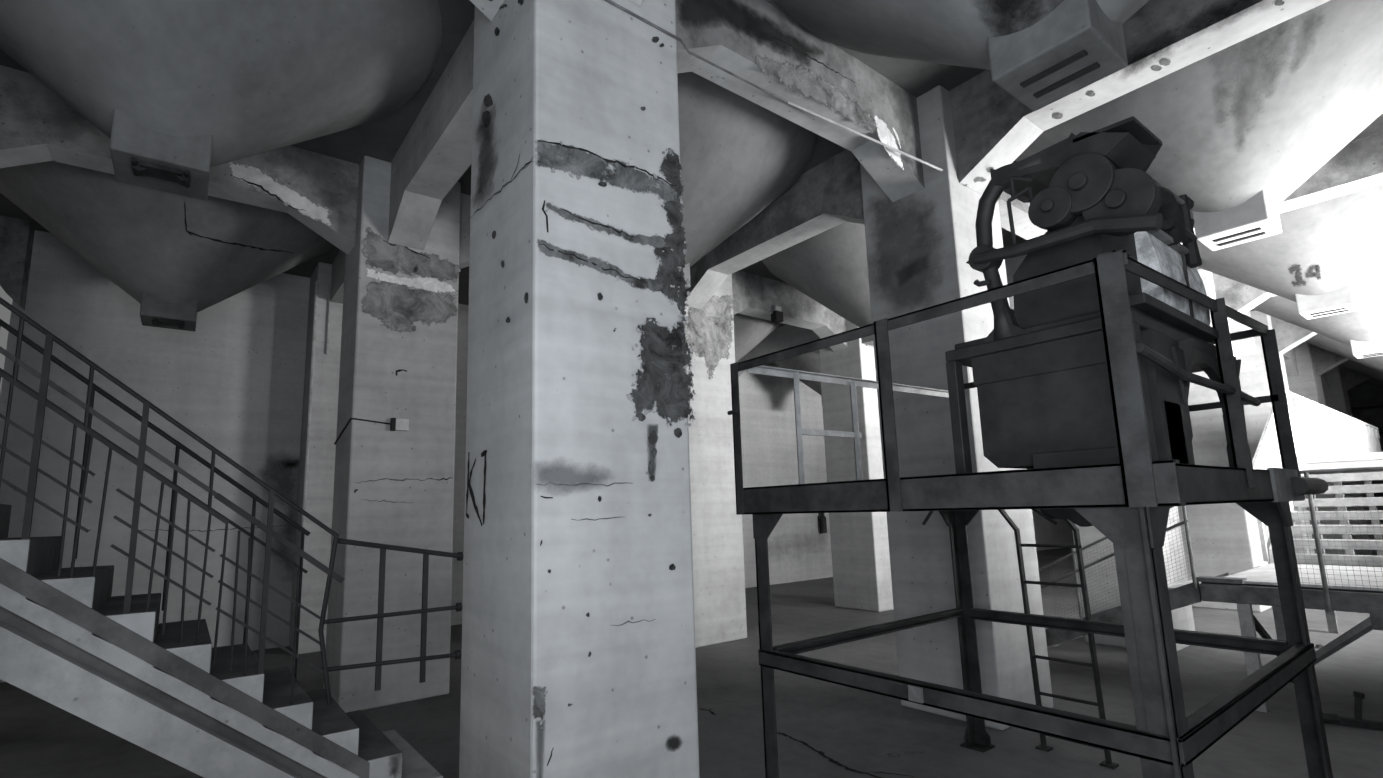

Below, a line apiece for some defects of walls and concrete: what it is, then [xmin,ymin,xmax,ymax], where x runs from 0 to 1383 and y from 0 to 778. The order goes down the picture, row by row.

spalling [228,161,333,226]
spalling [361,227,461,333]
peeling [536,140,734,482]
damp [540,468,597,487]
crack [777,732,914,778]